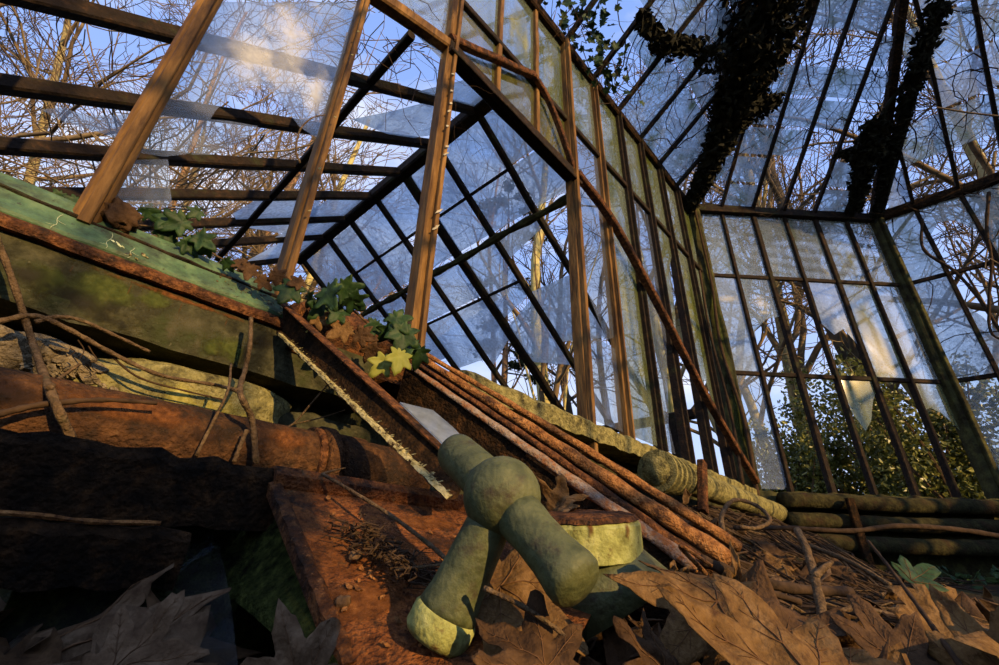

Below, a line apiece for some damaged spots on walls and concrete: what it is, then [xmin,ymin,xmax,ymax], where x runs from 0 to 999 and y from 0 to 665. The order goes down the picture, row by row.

corrosion [128,284,213,311]
corrosion [89,395,181,425]